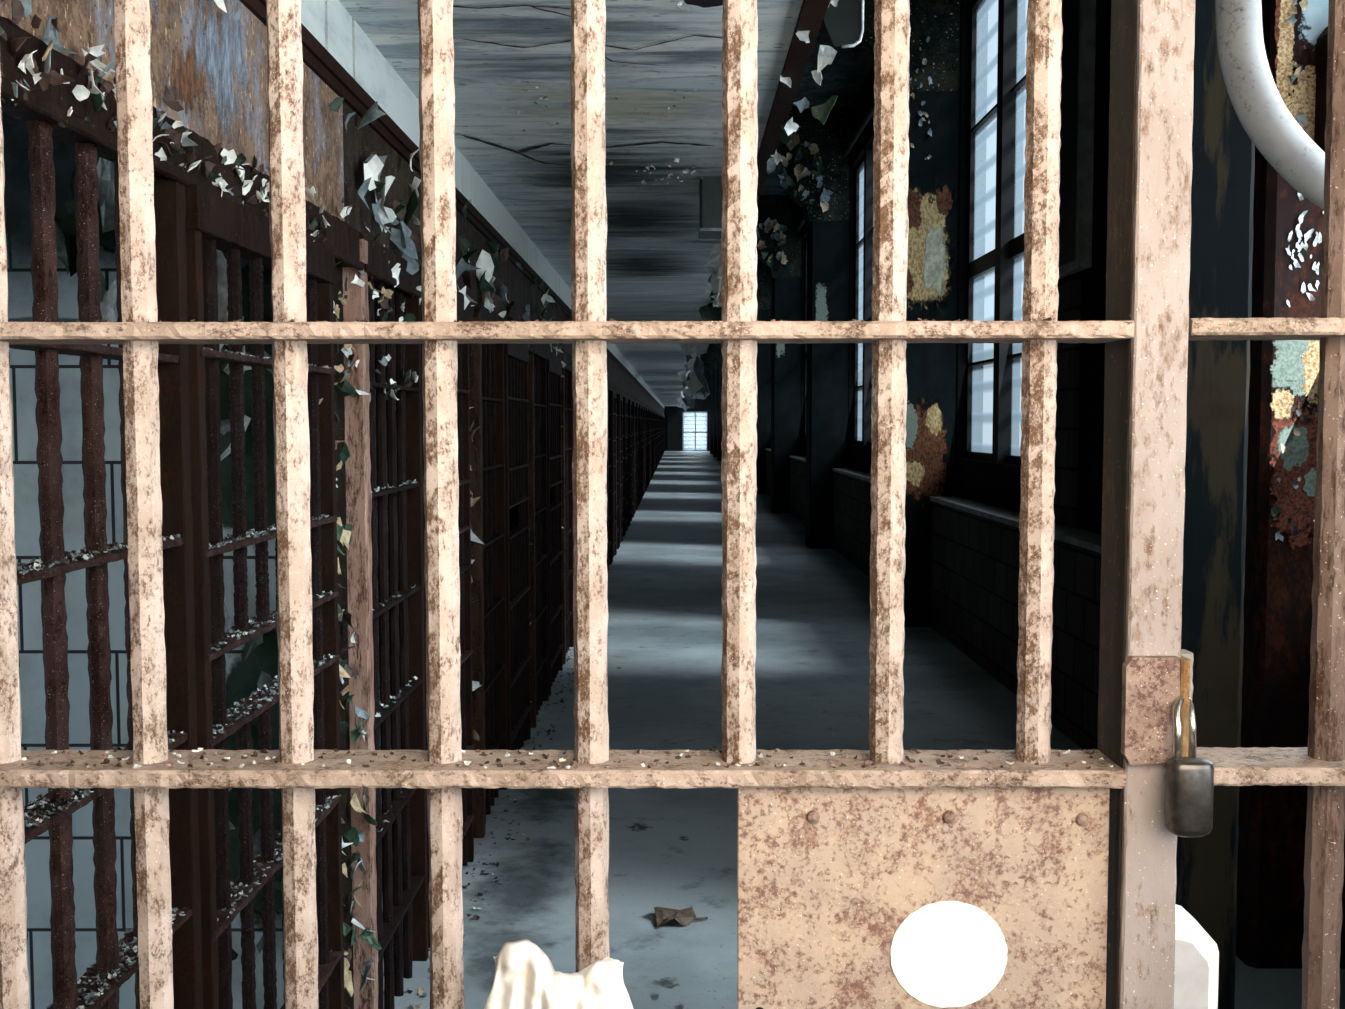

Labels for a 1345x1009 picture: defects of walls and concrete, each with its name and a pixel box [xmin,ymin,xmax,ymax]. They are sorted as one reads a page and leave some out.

corrosion [172,47,207,116]
leakage [605,22,649,36]
leakage [656,52,722,63]
peeling [1275,0,1329,141]
leakage [605,152,688,187]
peeling [306,149,422,322]
leakage [606,255,692,276]
leakage [607,205,699,235]
peeling [907,185,953,308]
peeling [1286,193,1324,307]
peeling [1270,340,1320,420]
corrosion [1268,402,1318,551]